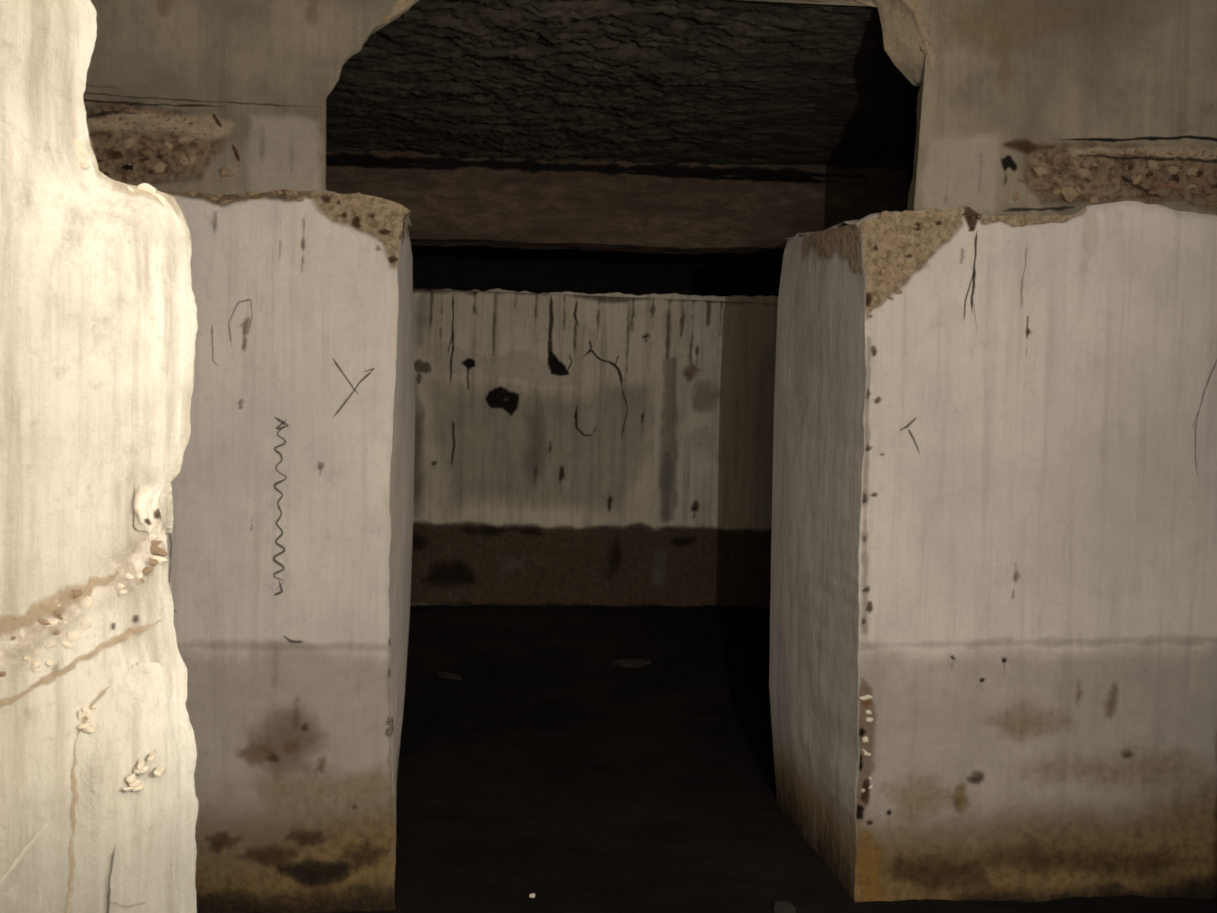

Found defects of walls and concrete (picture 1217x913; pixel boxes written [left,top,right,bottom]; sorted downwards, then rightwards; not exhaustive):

spalling [75,99,410,266]
spalling [802,136,1217,318]
spalling [0,480,173,706]
water stain [410,522,772,608]
water stain [195,809,396,913]
water stain [955,774,983,808]
water stain [854,790,1217,902]